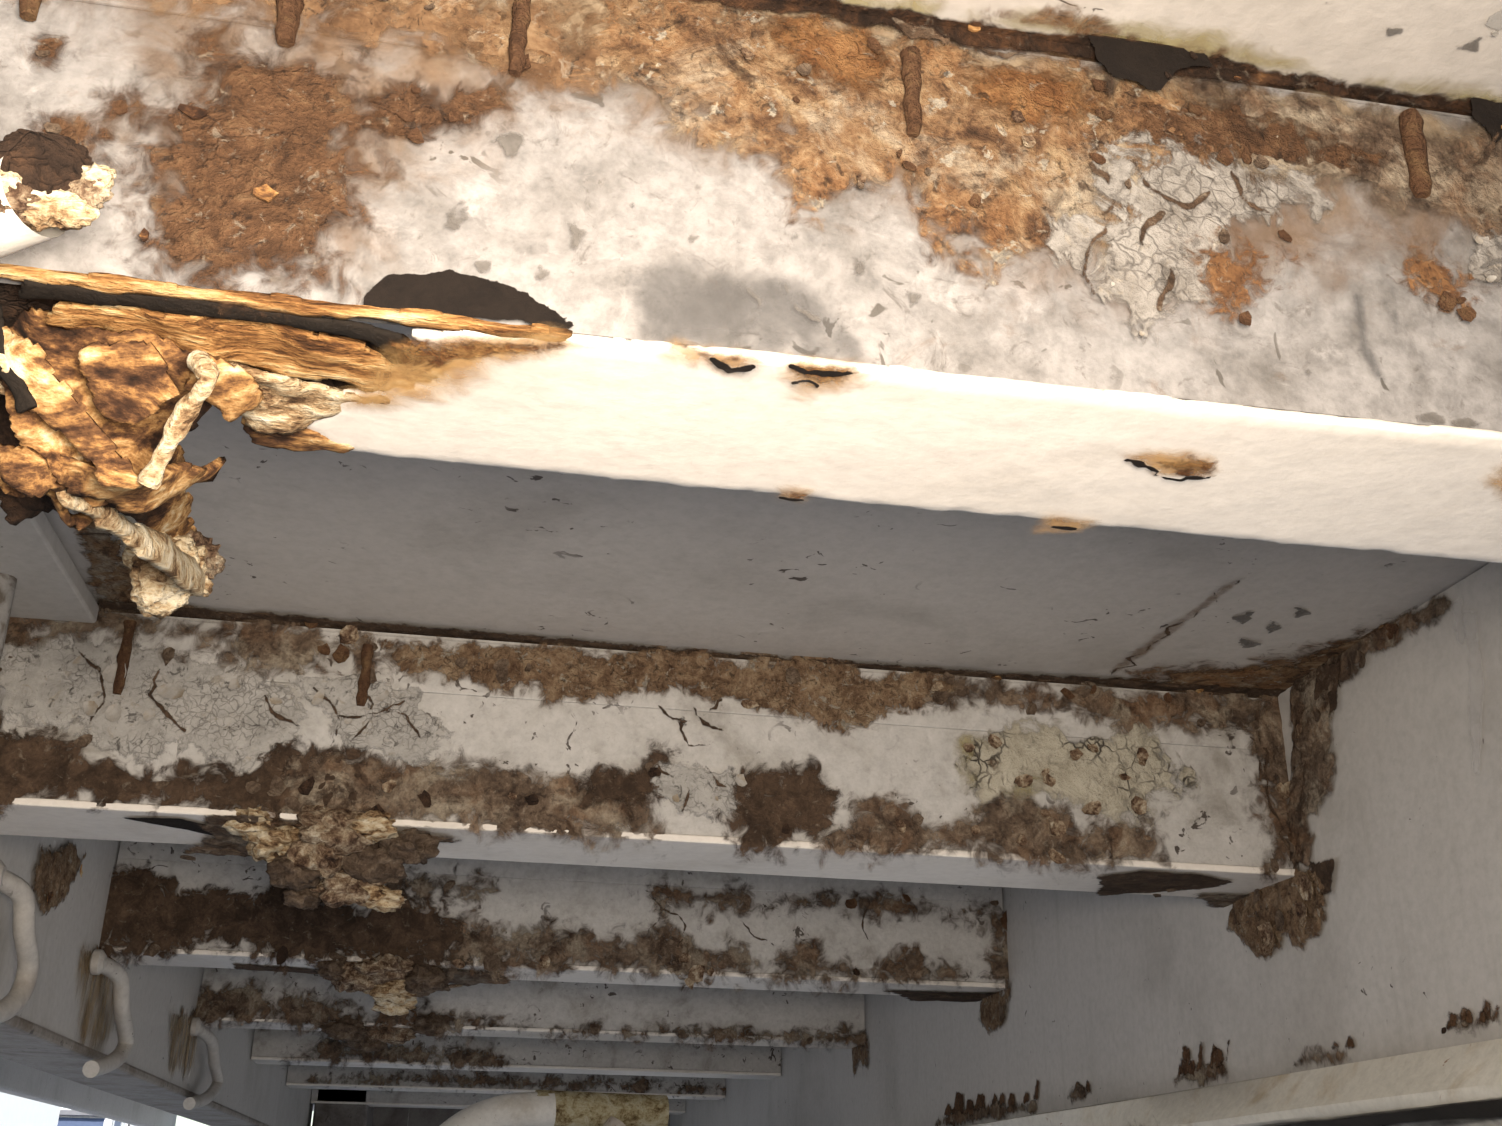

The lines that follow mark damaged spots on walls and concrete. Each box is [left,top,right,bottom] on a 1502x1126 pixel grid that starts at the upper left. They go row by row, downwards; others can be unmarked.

rust [152,0,277,36]
rust [298,0,632,93]
peeling [0,162,117,232]
peeling [1047,132,1335,341]
rust [672,342,756,373]
rust [788,361,853,388]
rust [1124,453,1216,482]
peeling [0,625,453,813]
peeling [648,761,747,821]
peeling [955,703,1198,864]
peeling [1270,664,1336,873]
spalling [1096,871,1252,908]